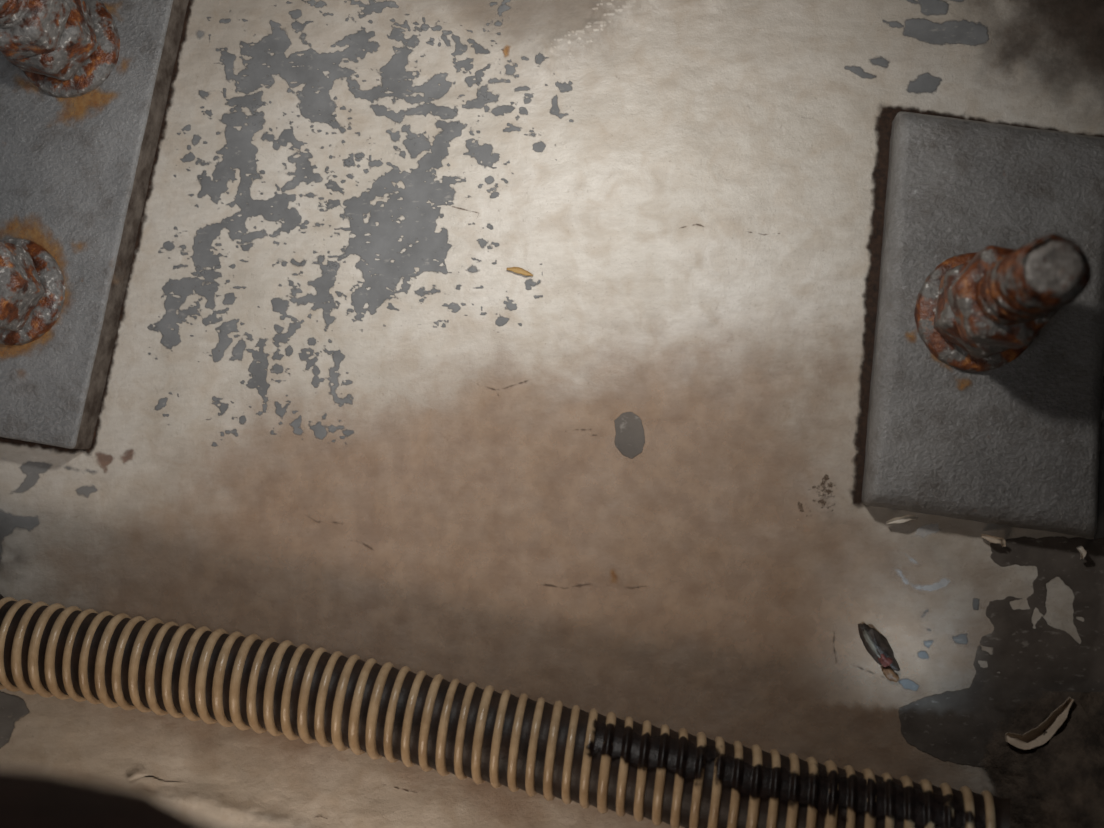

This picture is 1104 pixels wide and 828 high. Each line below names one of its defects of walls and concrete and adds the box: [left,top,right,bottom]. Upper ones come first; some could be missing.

peeling [883,0,989,46]
peeling [545,81,573,122]
peeling [845,57,889,79]
peeling [907,72,942,93]
rust [0,0,193,467]
peeling [147,0,548,447]
rust [851,107,1104,505]
peeling [614,412,645,459]
peeling [14,462,52,493]
peeling [0,511,39,559]
peeling [898,534,1104,767]
peeling [0,691,29,748]